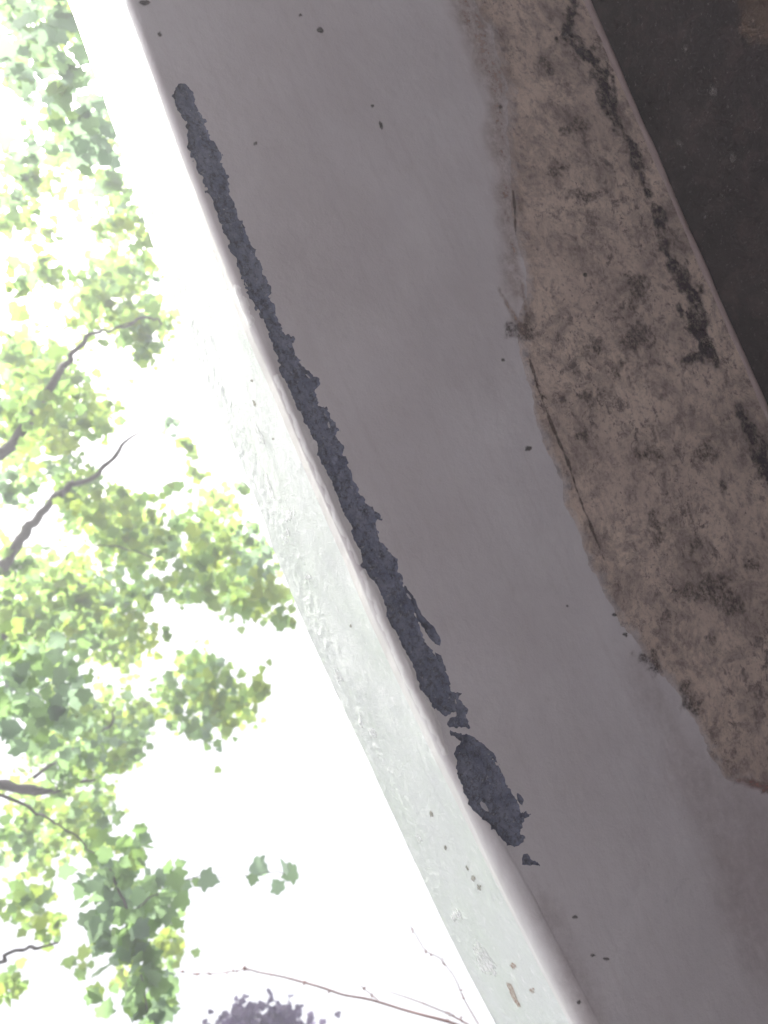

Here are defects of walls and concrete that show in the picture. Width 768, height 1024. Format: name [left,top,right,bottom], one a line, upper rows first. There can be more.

spalling [172,83,540,866]